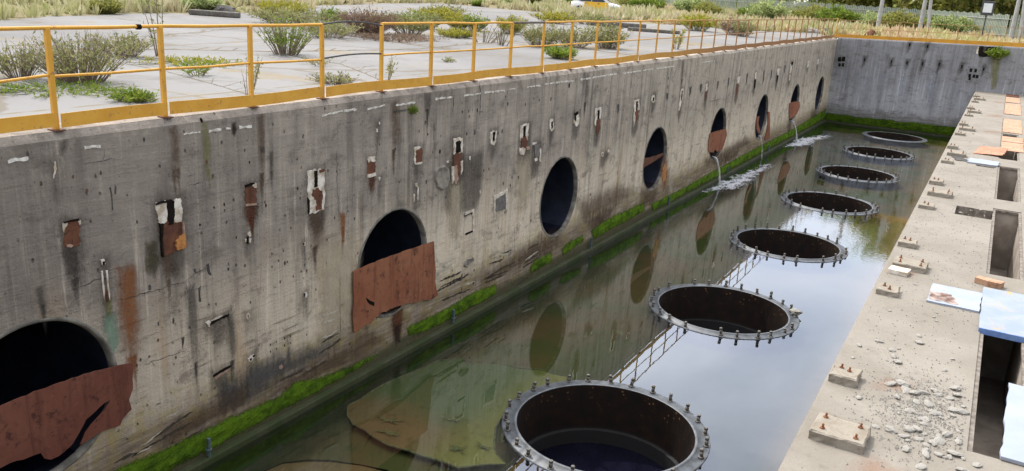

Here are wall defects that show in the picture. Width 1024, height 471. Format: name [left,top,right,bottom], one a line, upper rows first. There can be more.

corrosion [246,206,256,230]
crack [69,267,204,300]
corrosion [121,267,137,374]
water stain [170,215,374,440]
corrosion [392,309,402,341]